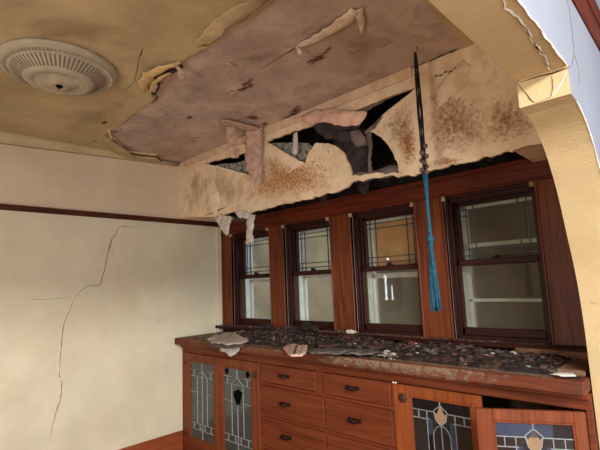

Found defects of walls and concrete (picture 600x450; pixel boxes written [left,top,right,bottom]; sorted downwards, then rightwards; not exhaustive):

spalling [104,0,463,185]
crack [503,0,580,111]
spalling [517,0,568,65]
spalling [577,101,600,171]
crack [35,224,141,437]